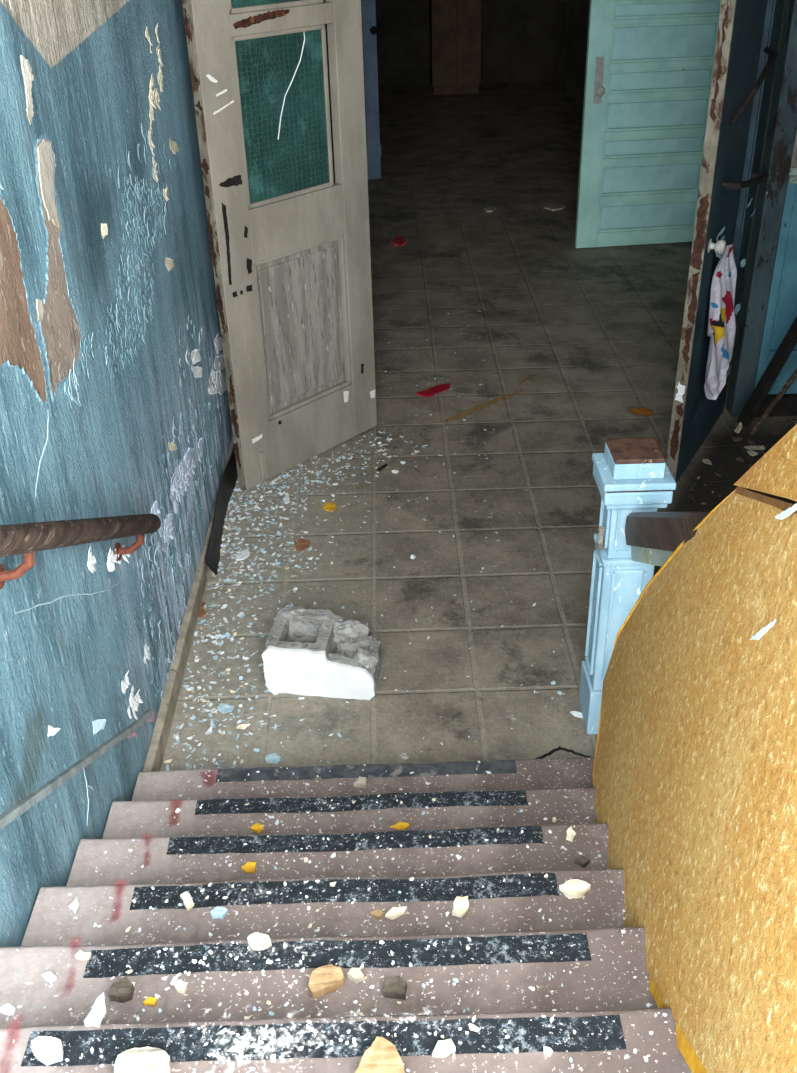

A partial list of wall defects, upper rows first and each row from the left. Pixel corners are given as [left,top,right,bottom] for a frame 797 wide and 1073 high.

peeling [20,55,34,125]
peeling [145,23,169,202]
rust [710,0,729,122]
spalling [0,134,83,407]
rust [201,159,225,334]
rust [683,195,710,363]